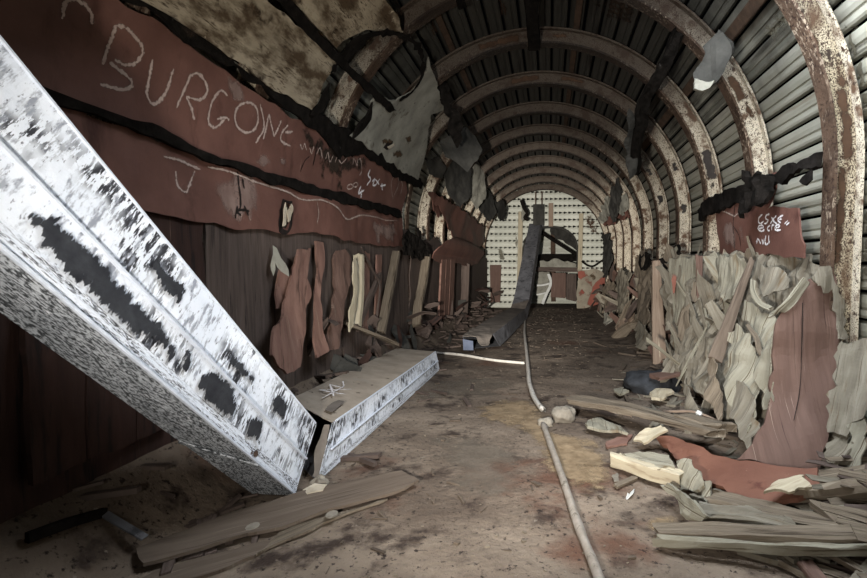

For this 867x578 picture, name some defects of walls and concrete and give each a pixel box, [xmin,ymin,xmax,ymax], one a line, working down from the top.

rust [727,75,755,118]
rust [834,58,855,264]
peeling [715,254,747,302]
peeling [742,300,777,410]
peeling [575,357,728,449]
peeling [704,436,741,460]
peeling [737,552,837,567]